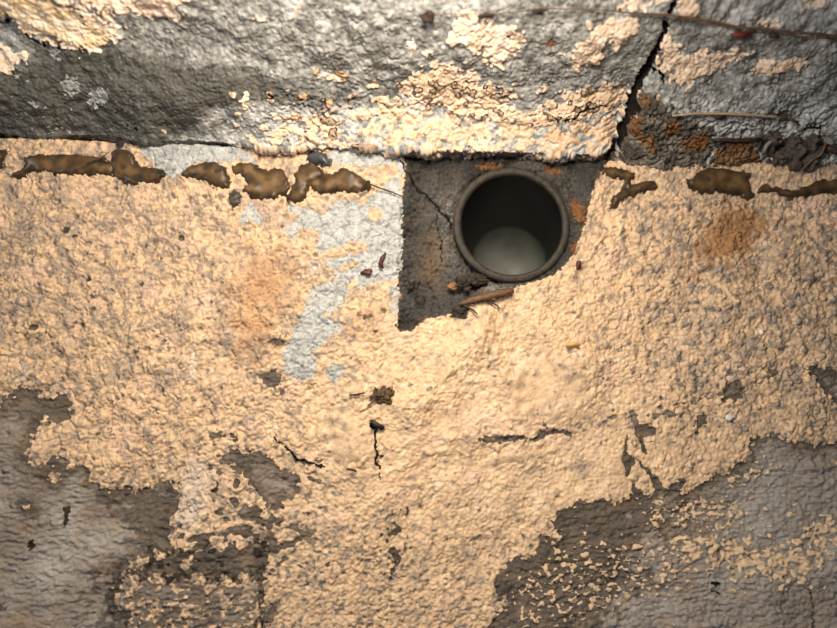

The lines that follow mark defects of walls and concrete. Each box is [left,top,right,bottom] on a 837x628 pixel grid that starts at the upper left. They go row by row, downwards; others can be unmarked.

peeling [60,74,109,109]
crack [564,0,679,160]
crack [803,123,824,131]
corrosion [695,205,767,256]
spalling [258,150,608,390]
peeling [629,365,745,435]
peeling [805,366,837,405]
crack [273,436,325,468]
crack [369,419,386,480]
peeling [478,421,576,444]
peeling [0,384,322,628]
peeling [487,431,837,628]